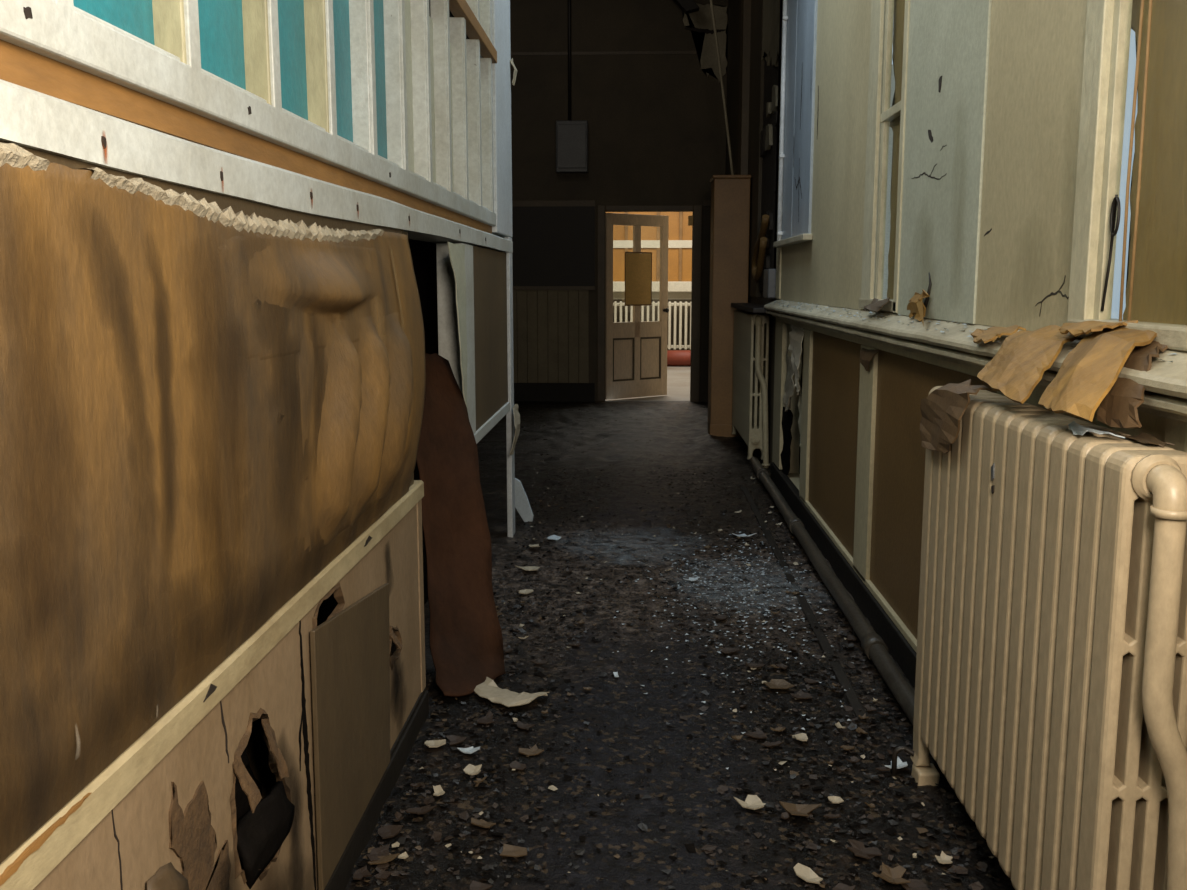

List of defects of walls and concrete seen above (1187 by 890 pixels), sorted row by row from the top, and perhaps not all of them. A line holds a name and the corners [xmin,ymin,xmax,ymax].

peeling [0,142,50,171]
peeling [80,167,385,243]
peeling [232,748,262,823]
peeling [146,781,244,890]